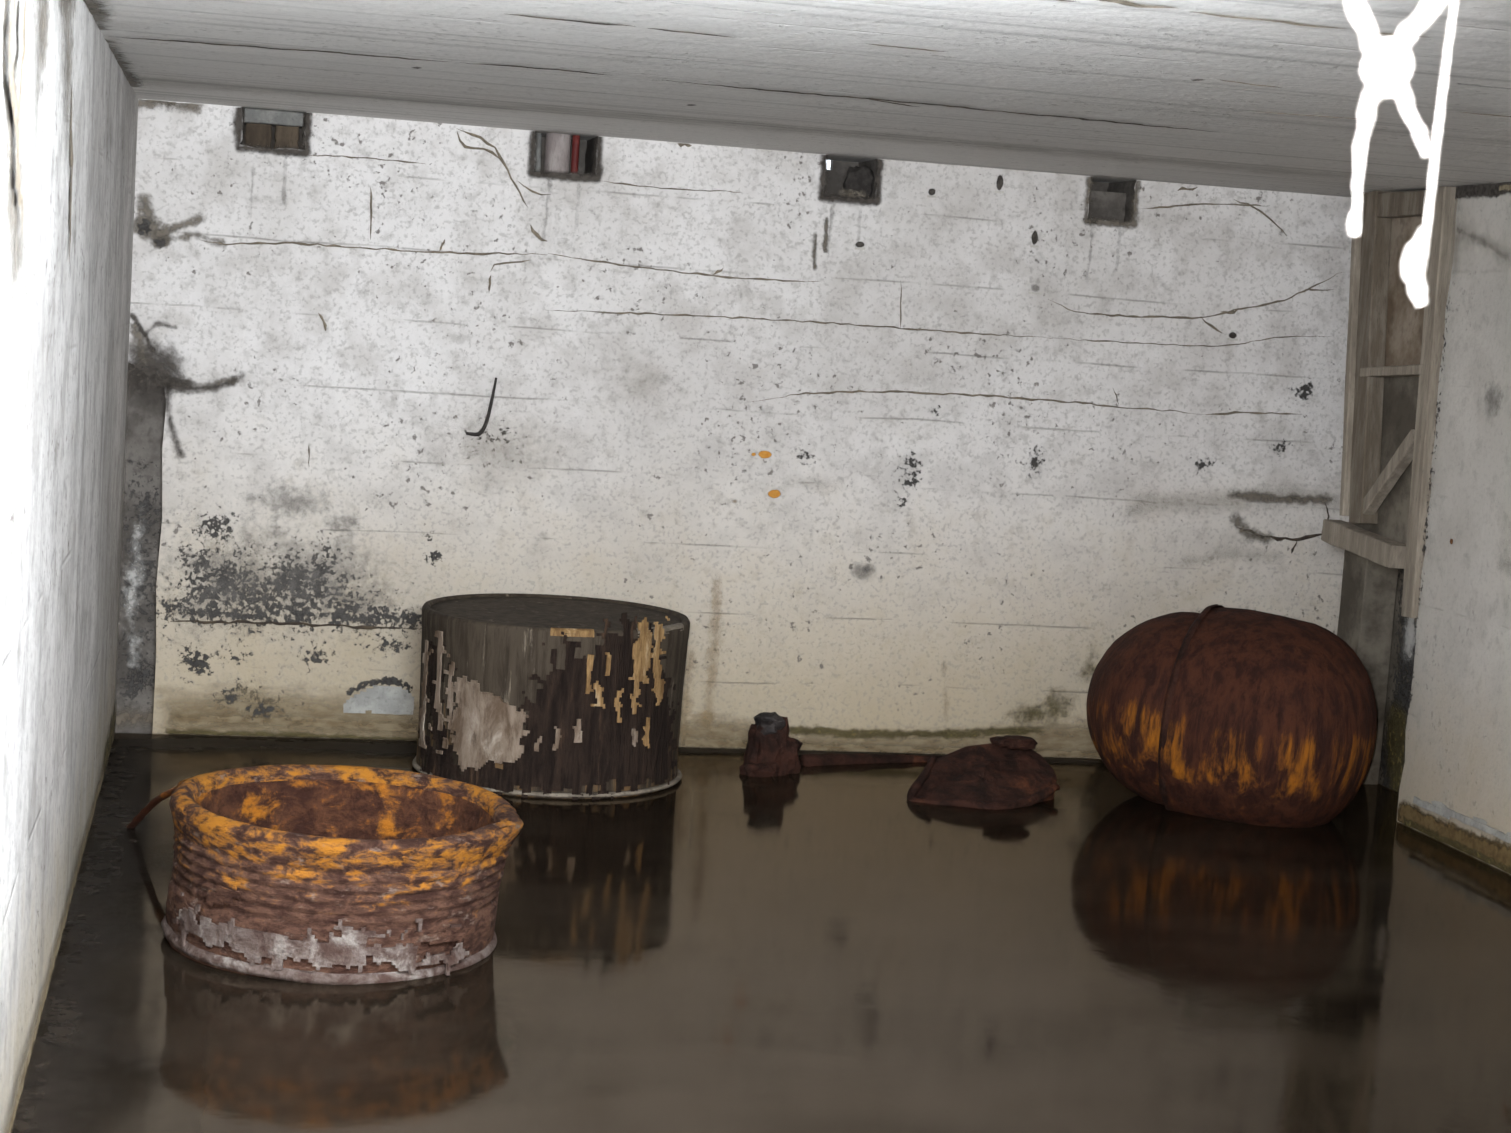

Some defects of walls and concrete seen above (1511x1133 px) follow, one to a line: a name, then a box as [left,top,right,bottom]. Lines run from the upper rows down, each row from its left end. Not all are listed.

crack [1057,0,1432,38]
water stain [38,0,202,120]
water stain [3,0,22,282]
crack [201,129,818,291]
crack [1145,187,1287,236]
crack [548,272,1342,347]
crack [752,389,1301,415]
water stain [1231,492,1332,543]
water stain [679,722,749,749]
water stain [790,696,1100,758]
water stain [6,460,422,1133]